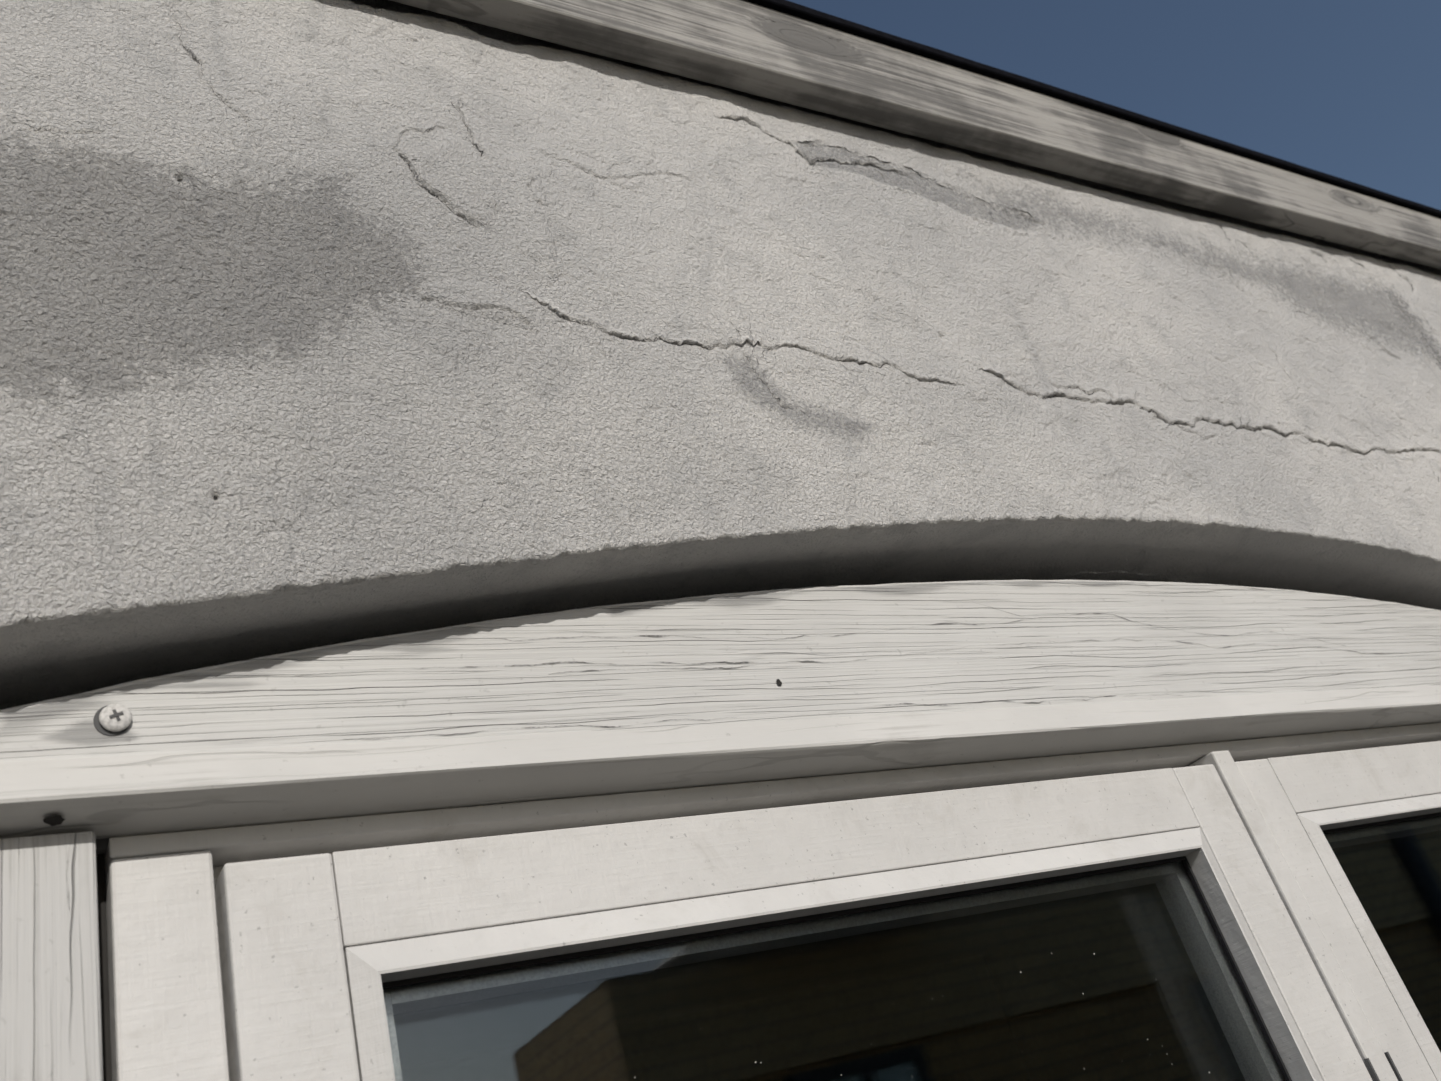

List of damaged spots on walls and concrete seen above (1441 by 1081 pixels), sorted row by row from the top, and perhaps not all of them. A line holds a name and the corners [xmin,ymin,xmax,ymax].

crack [179,16,233,126]
crack [398,102,485,228]
crack [715,111,907,184]
crack [521,290,1441,481]